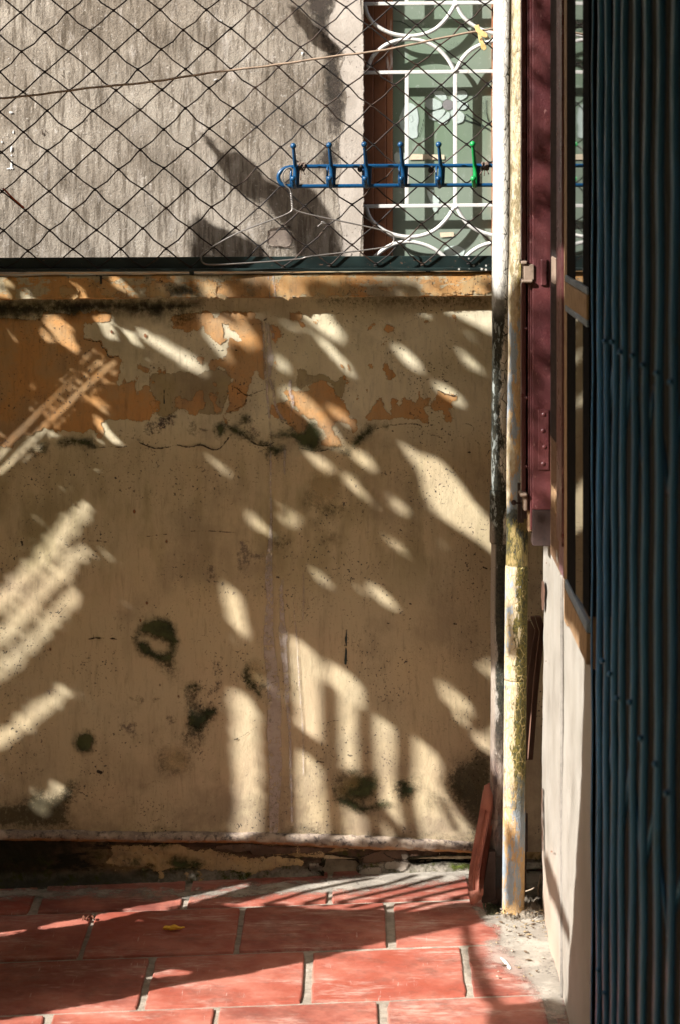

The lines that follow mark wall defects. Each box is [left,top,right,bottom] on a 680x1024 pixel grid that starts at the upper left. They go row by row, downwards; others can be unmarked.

peeling [241,273,358,328]
peeling [414,272,492,297]
peeling [0,278,281,449]
peeling [269,364,457,447]
damp [135,618,179,669]
damp [188,681,219,738]
damp [76,731,94,753]
damp [334,771,389,812]
damp [395,781,412,799]
damp [154,842,202,870]